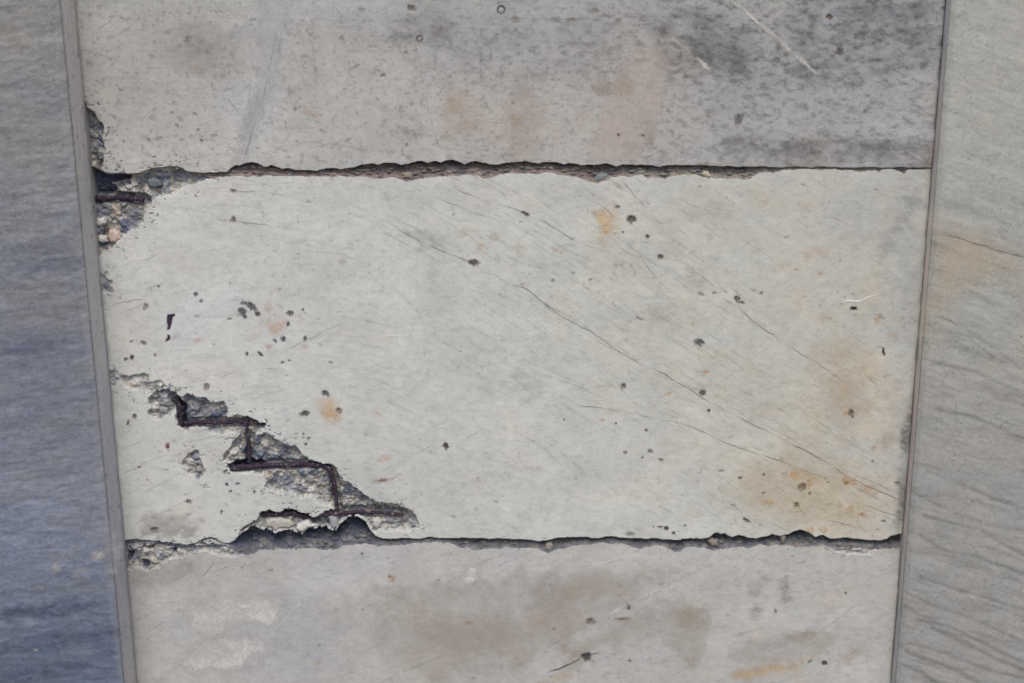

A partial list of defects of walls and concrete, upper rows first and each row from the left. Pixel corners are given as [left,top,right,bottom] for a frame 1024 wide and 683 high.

spalling [85,91,219,300]
spalling [109,355,425,578]